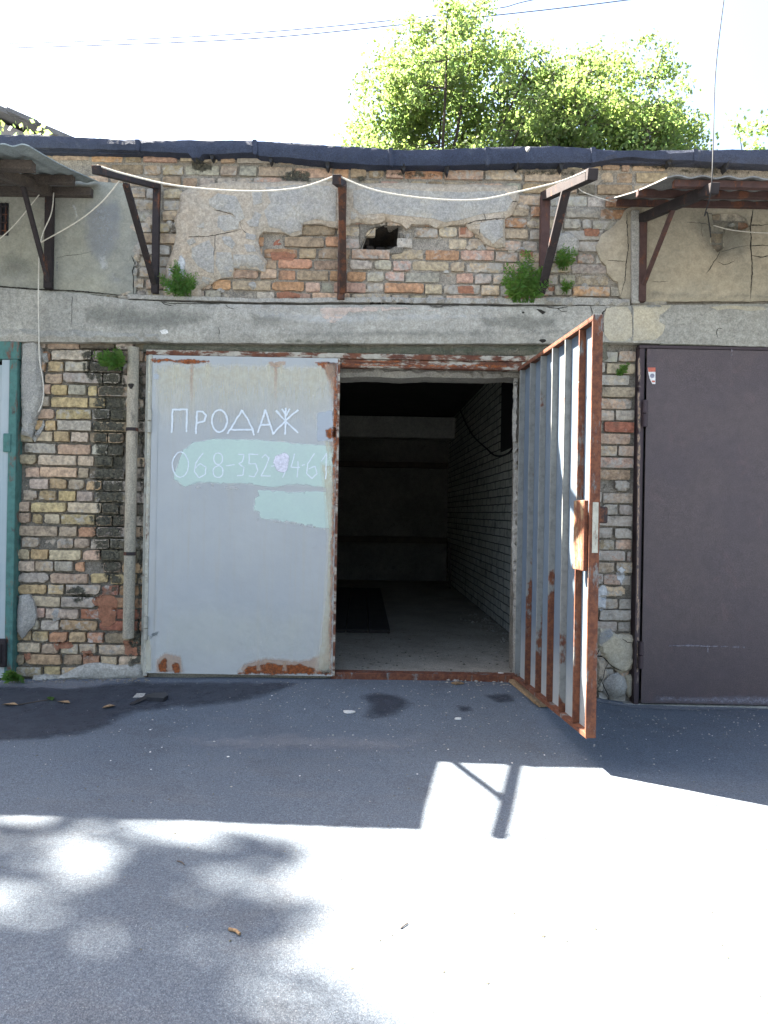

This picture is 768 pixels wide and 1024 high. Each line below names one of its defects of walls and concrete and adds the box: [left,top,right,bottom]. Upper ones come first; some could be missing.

crack [190,210,246,251]
flaking render [98,184,672,362]
crack [666,211,768,298]
corrosion [238,360,513,675]